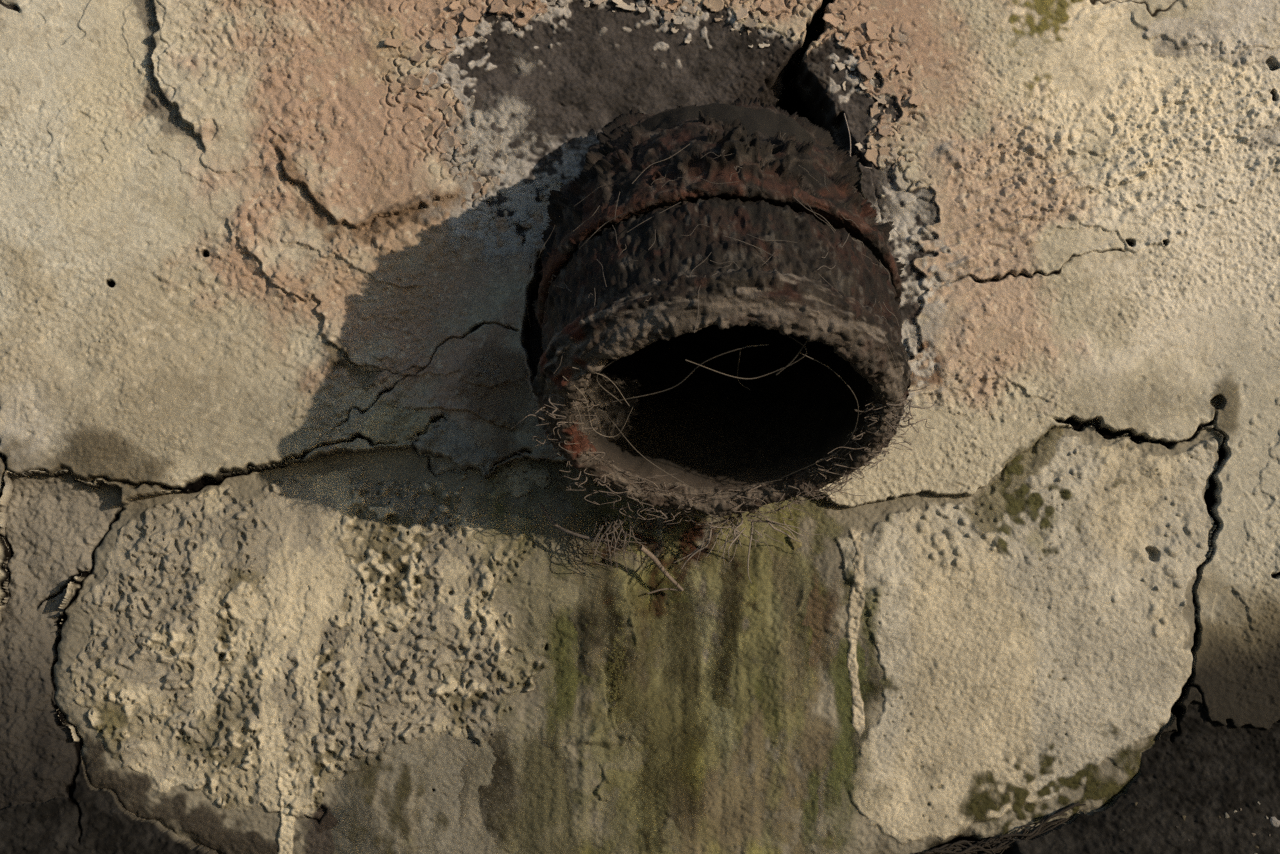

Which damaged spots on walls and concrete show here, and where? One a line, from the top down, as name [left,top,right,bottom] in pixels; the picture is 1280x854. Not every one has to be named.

spalling [135,0,204,148]
peeling [276,0,940,360]
crack [950,249,1125,284]
crack [1090,0,1177,17]
crack [149,323,530,494]
crack [0,442,123,839]
water stain [525,608,601,854]
water stain [805,595,881,828]
peeling [837,426,1218,843]
crack [1056,409,1227,725]